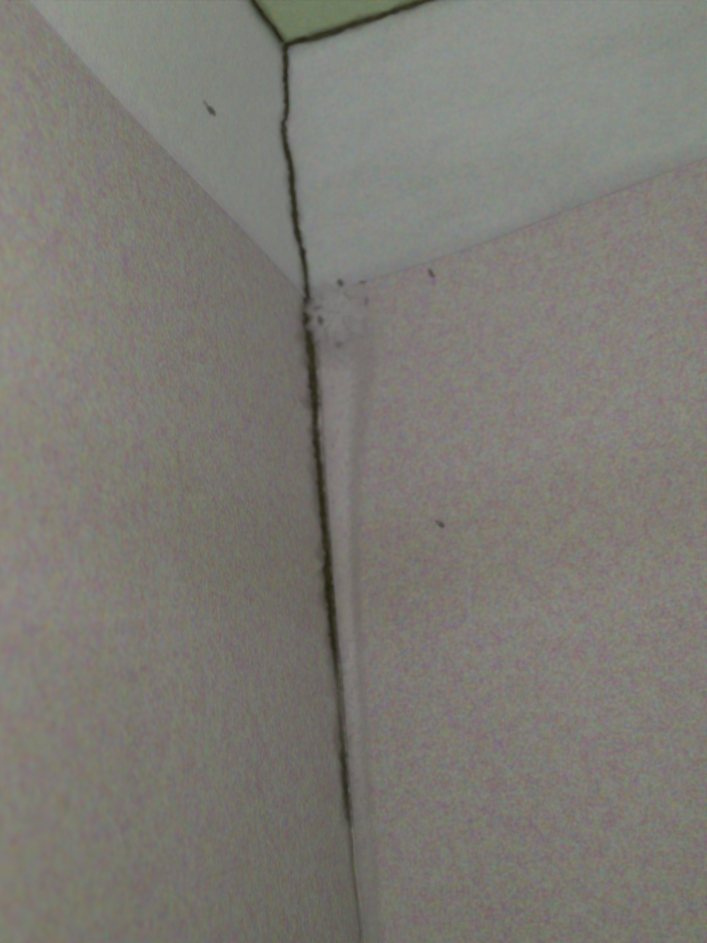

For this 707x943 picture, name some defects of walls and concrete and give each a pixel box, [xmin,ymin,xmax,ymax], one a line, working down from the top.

crack [252,0,431,671]
crack [341,749,349,804]